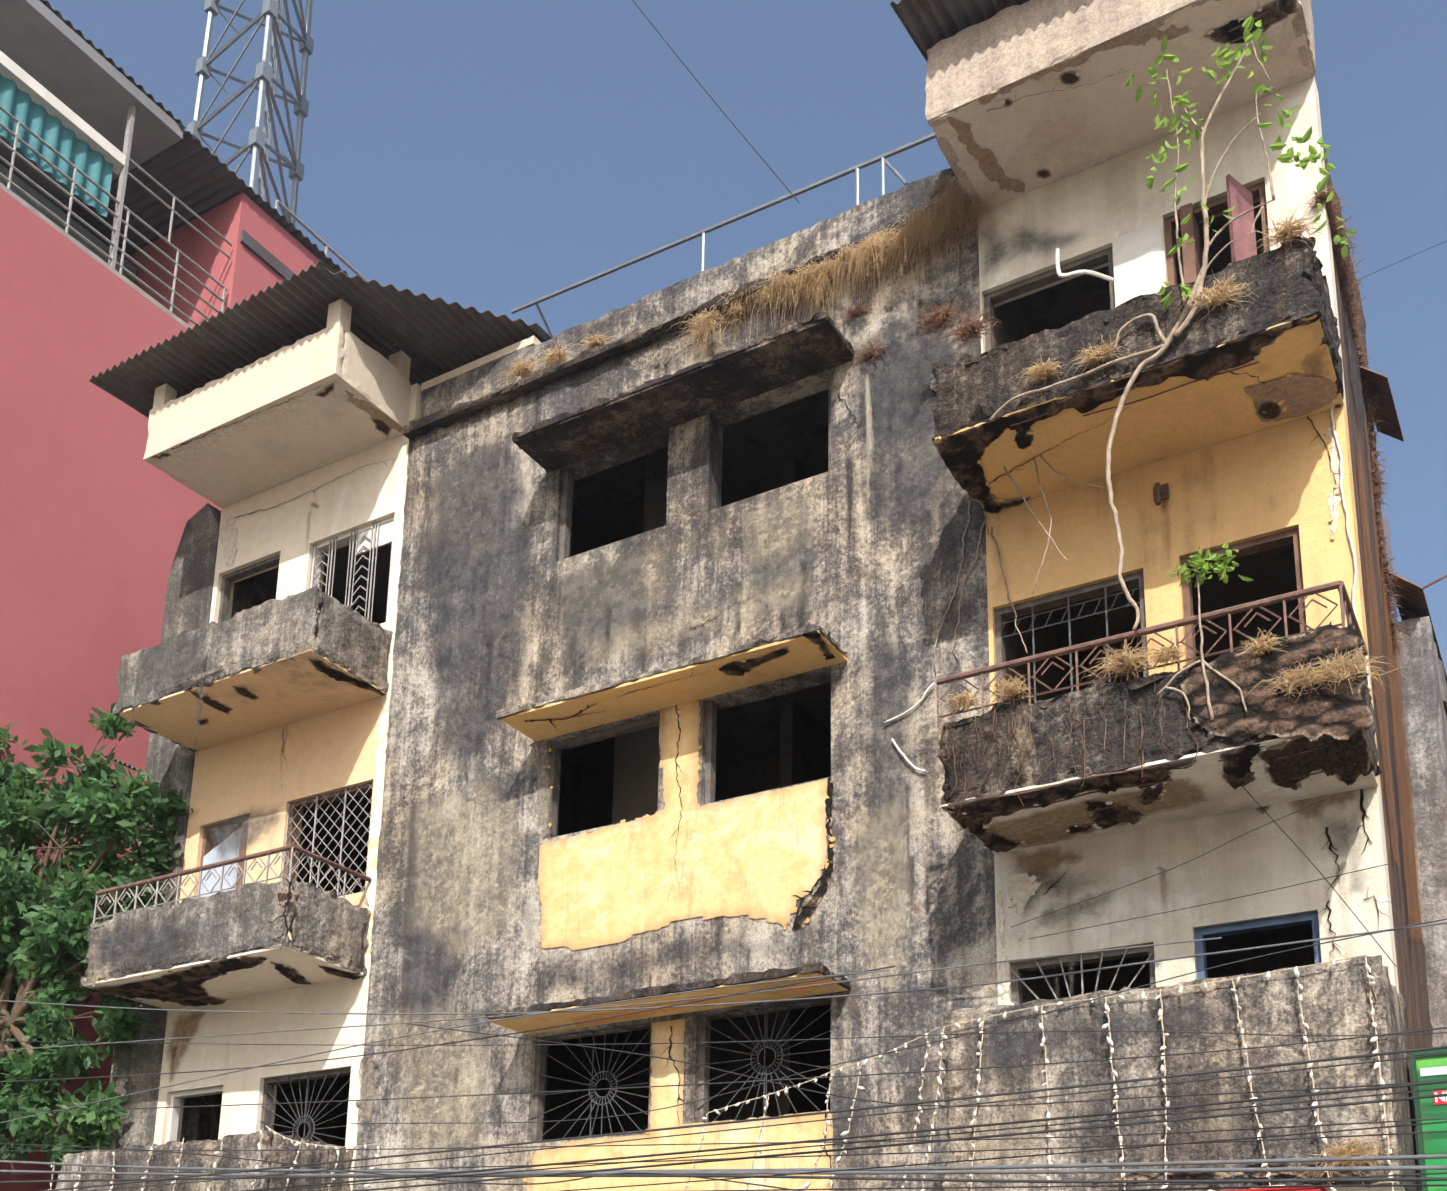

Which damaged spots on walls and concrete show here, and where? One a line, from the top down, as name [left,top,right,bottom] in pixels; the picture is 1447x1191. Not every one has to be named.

peeling [978,0,1301,107]
water stain [862,314,951,525]
spalling [933,318,1310,513]
water stain [432,447,533,760]
spalling [81,957,311,1007]
water stain [403,804,458,1128]
crack [525,672,706,893]
crack [660,1026,684,1120]
spalling [784,782,836,931]
water stain [870,644,914,901]
spalling [942,760,1196,853]
crack [1320,789,1400,1058]